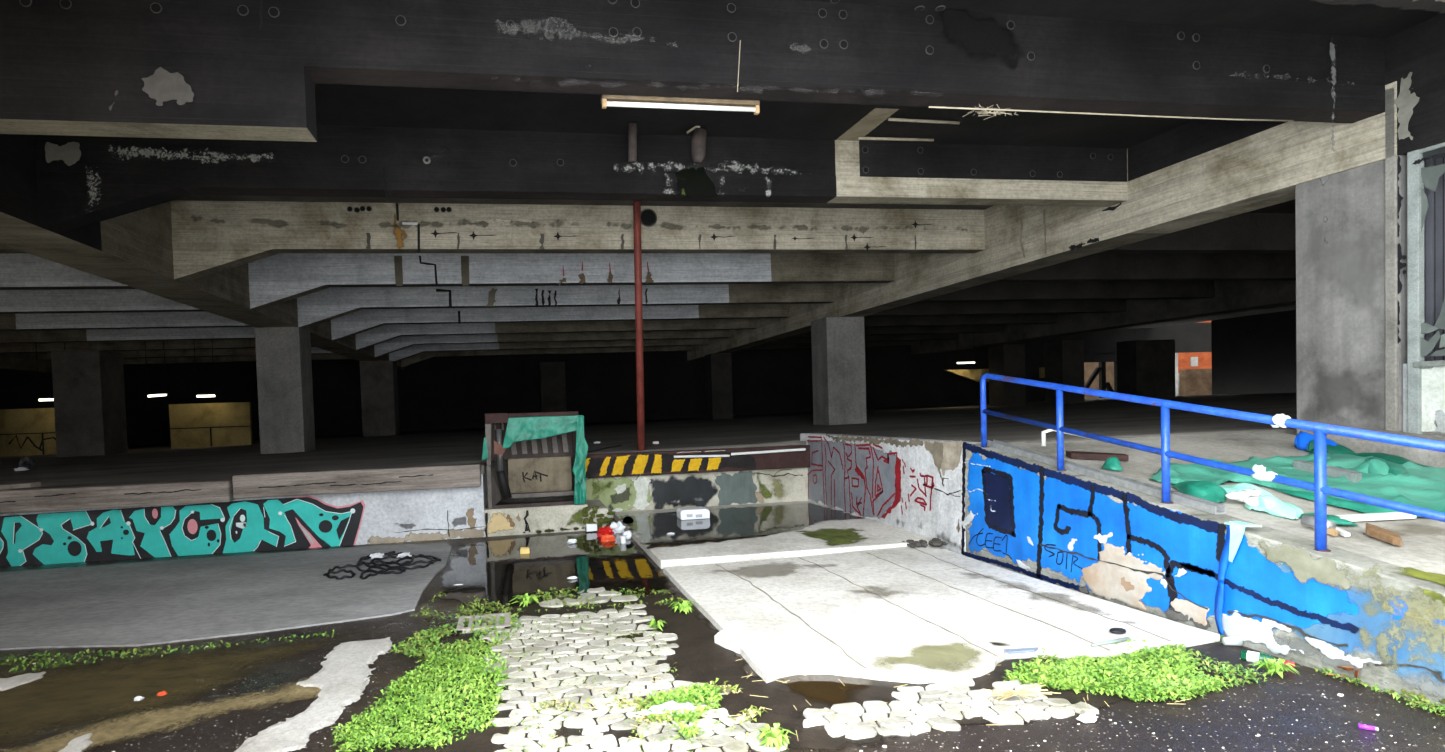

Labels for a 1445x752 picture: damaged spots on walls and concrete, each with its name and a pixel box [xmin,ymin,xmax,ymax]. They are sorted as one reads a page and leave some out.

peeling [142,67,194,106]
peeling [1422,366,1445,432]
flaking render [826,434,962,479]
peeling [1068,532,1382,668]